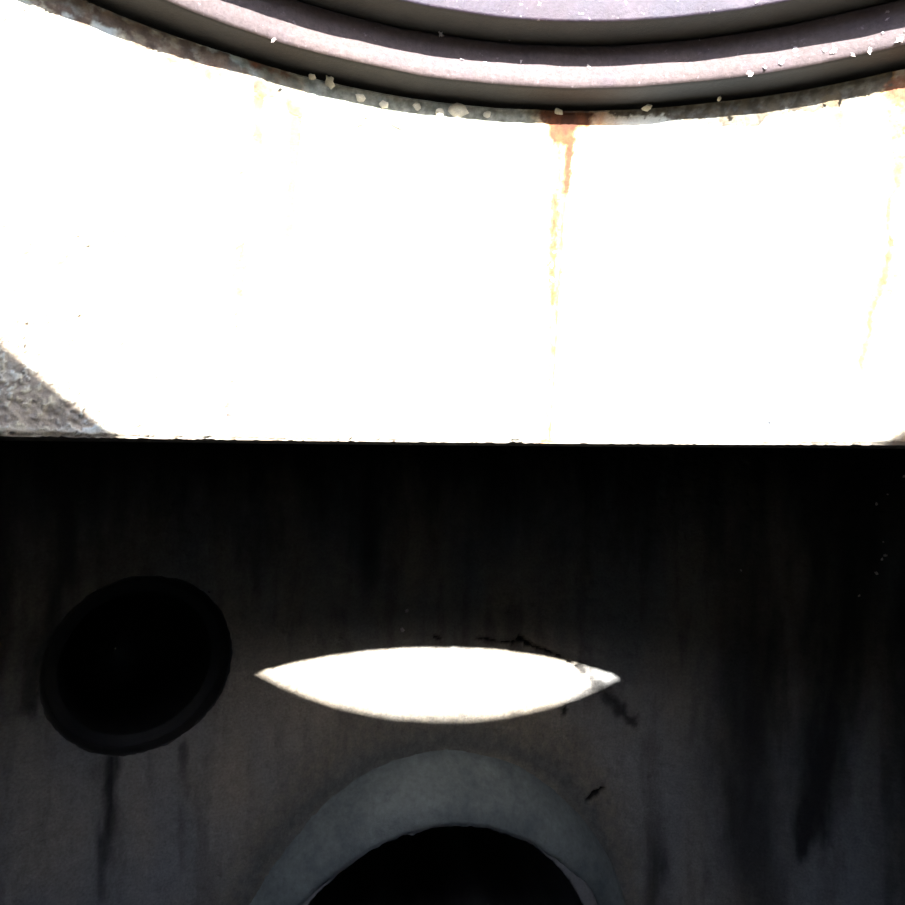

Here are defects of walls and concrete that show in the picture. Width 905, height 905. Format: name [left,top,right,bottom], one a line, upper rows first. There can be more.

rust [861,69,905,219]
leakage [0,0,532,443]
rust [521,110,653,444]
peeling [0,310,238,432]
rust [869,380,905,445]
crack [430,633,443,643]
leakage [0,336,905,905]
crack [474,633,645,734]